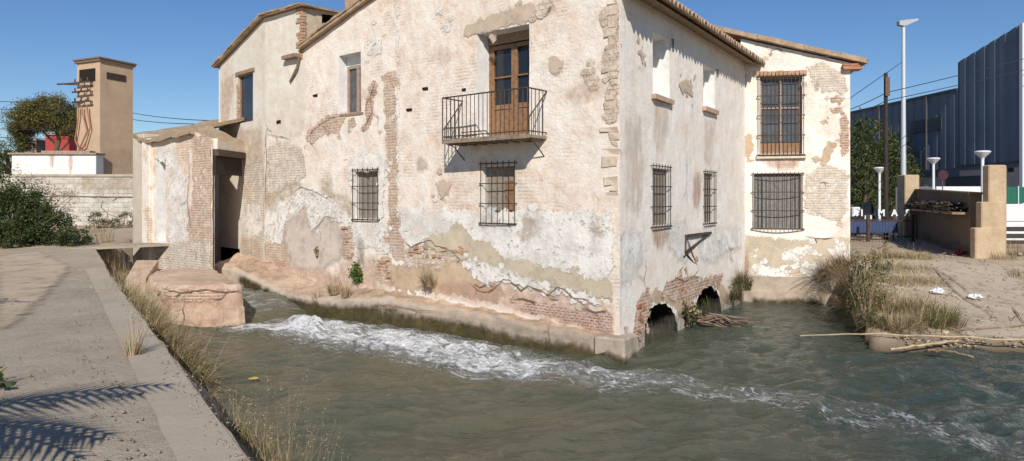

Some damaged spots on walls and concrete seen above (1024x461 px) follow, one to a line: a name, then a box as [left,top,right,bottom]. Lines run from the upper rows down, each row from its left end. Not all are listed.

flaking render [529,0,556,23]
flaking render [581,1,619,124]
flaking render [155,133,212,269]
crack [403,240,463,263]
crack [471,279,609,346]
peeling [240,55,850,341]